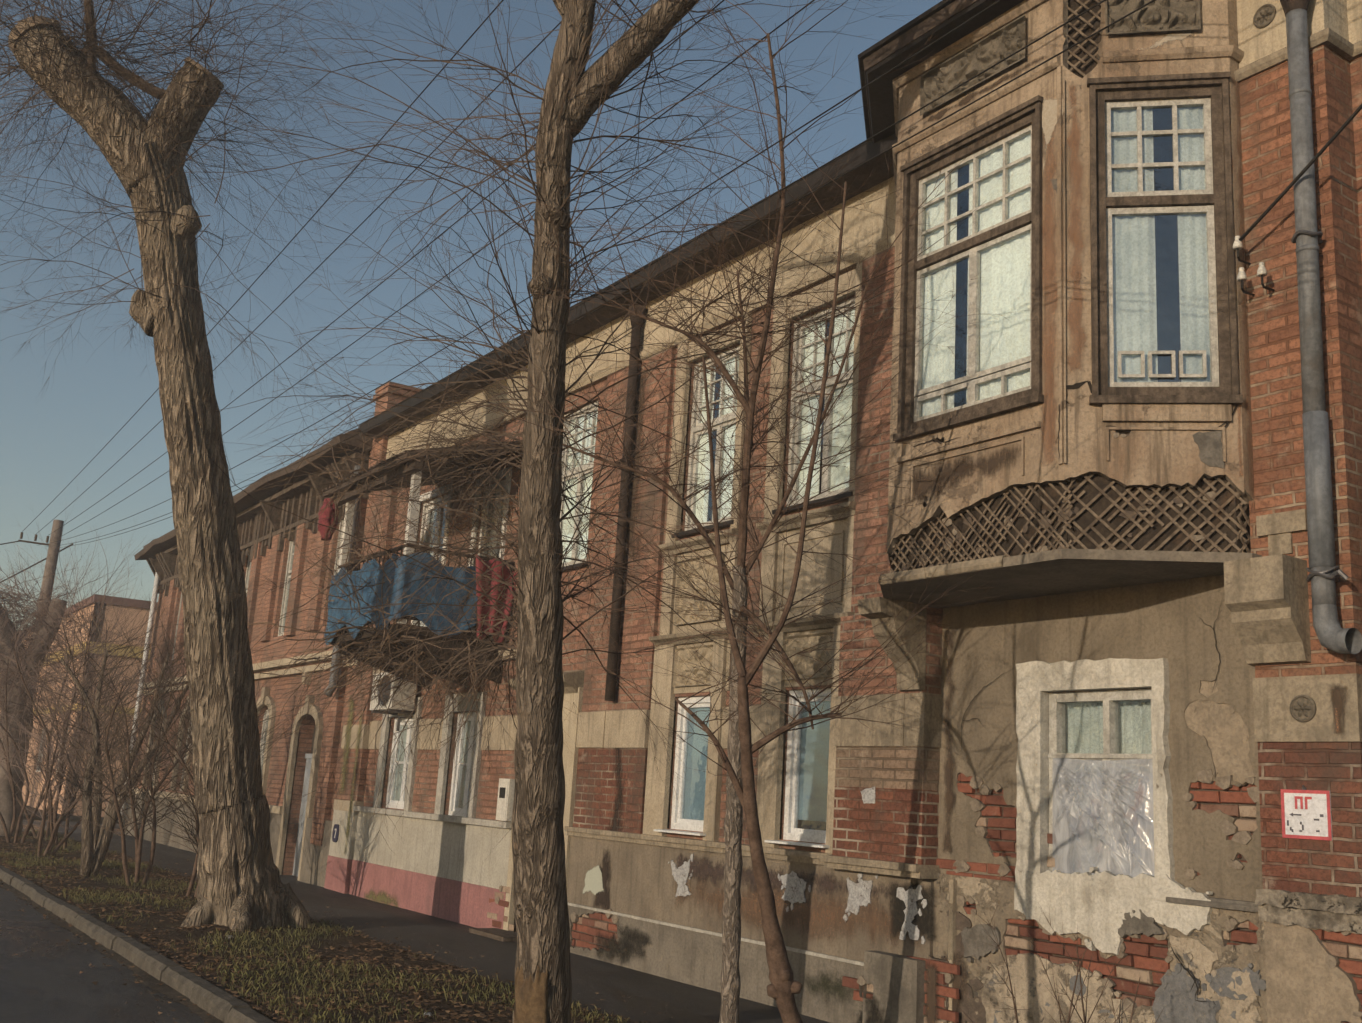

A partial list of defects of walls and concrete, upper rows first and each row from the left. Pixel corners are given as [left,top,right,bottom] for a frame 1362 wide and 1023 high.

spalling [1182,681,1260,870]
spalling [936,773,1017,882]
spalling [1047,833,1056,868]
spalling [571,909,620,950]
spalling [906,895,1222,1023]
spalling [1223,918,1266,1007]
spalling [1313,929,1362,1023]